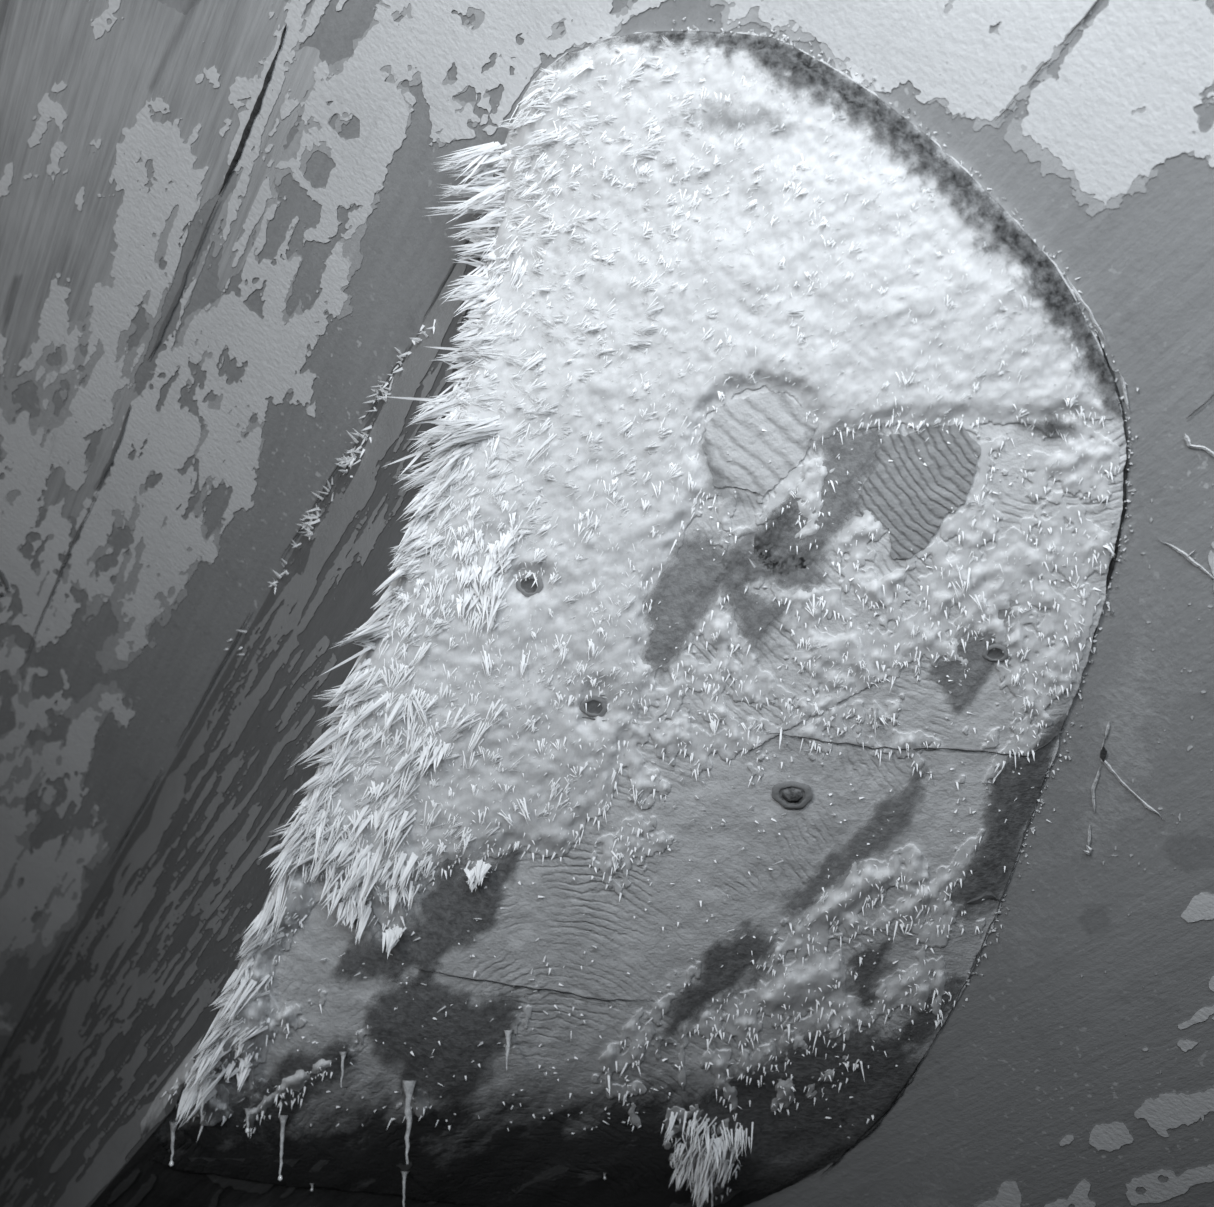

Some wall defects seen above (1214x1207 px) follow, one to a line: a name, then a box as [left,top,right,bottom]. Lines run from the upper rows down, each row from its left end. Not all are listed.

crack [1184,393,1214,457]
peeling [1194,518,1214,576]
damp [1035,613,1199,867]
peeling [1181,892,1214,923]
peeling [1177,976,1214,1052]
peeling [1089,1088,1214,1152]
peeling [670,1185,745,1207]
peeling [973,1181,1021,1207]
peeling [1044,1179,1096,1207]
peeling [1125,1164,1214,1206]